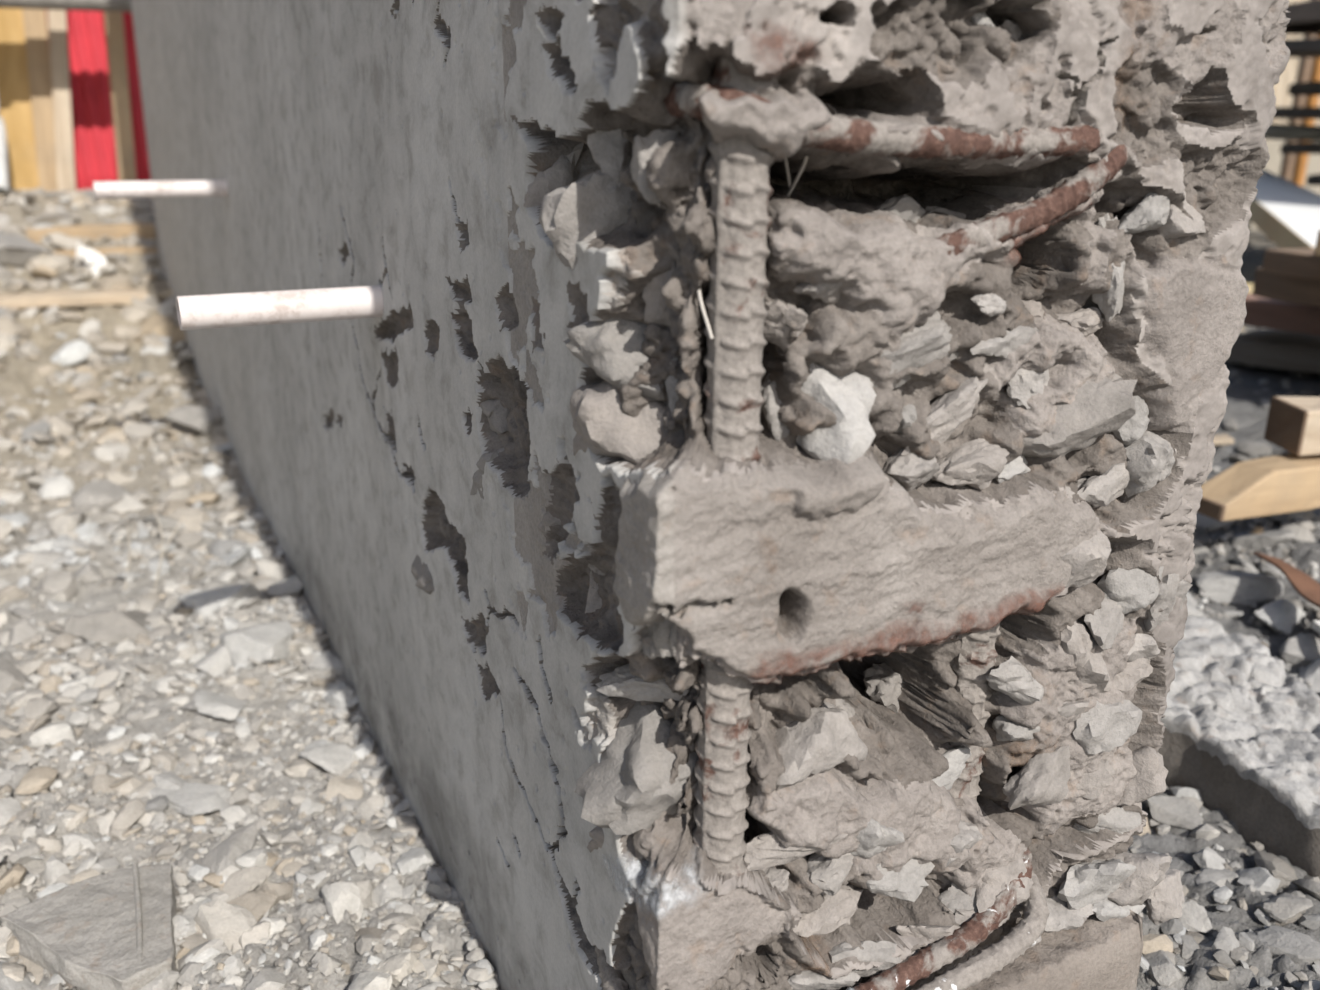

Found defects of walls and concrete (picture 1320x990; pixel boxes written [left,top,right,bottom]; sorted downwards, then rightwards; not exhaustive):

peeling [501,0,578,122]
peeling [1117,0,1290,104]
peeling [507,185,544,406]
spalling [577,0,1128,462]
peeling [1128,252,1249,433]
peeling [514,450,597,634]
peeling [578,693,618,744]
peeling [632,618,677,660]
peeling [951,615,1143,835]
spalling [595,659,1184,990]